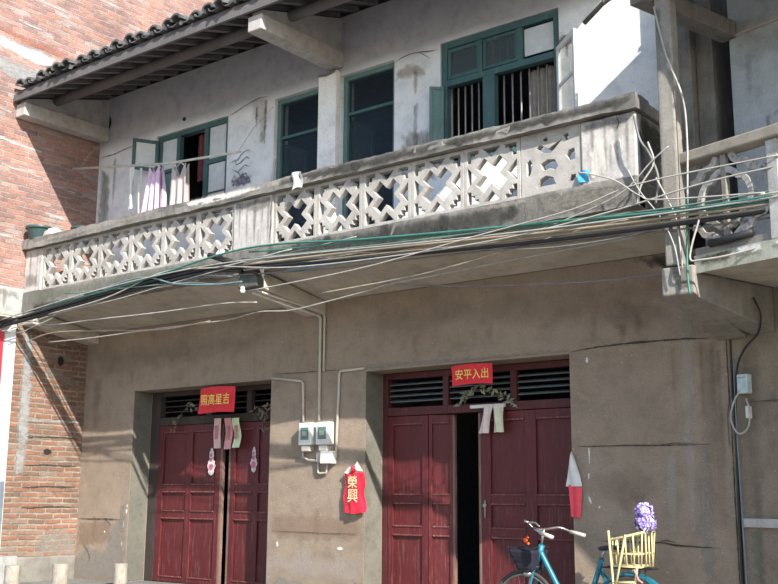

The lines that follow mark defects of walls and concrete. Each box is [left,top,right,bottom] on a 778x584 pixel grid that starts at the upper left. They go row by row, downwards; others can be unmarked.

damp [282,97,626,183]
crack [573,338,704,352]
crack [578,441,708,449]
crack [606,340,740,583]